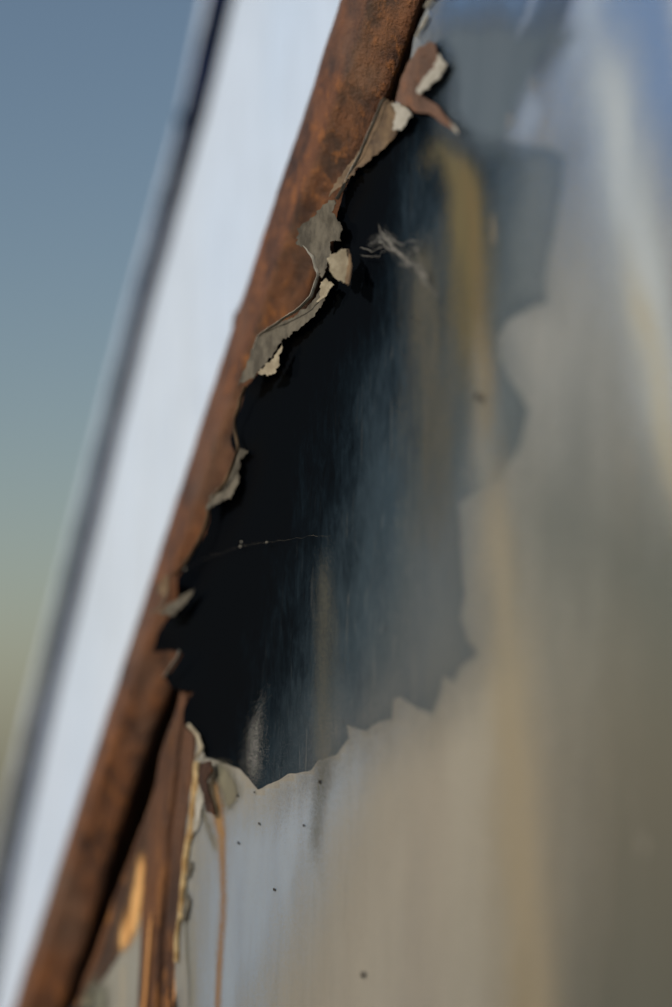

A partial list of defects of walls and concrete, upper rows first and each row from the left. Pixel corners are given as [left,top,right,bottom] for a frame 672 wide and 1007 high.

rust [395,41,459,135]
peeling [148,34,565,962]
rust [74,690,230,1007]